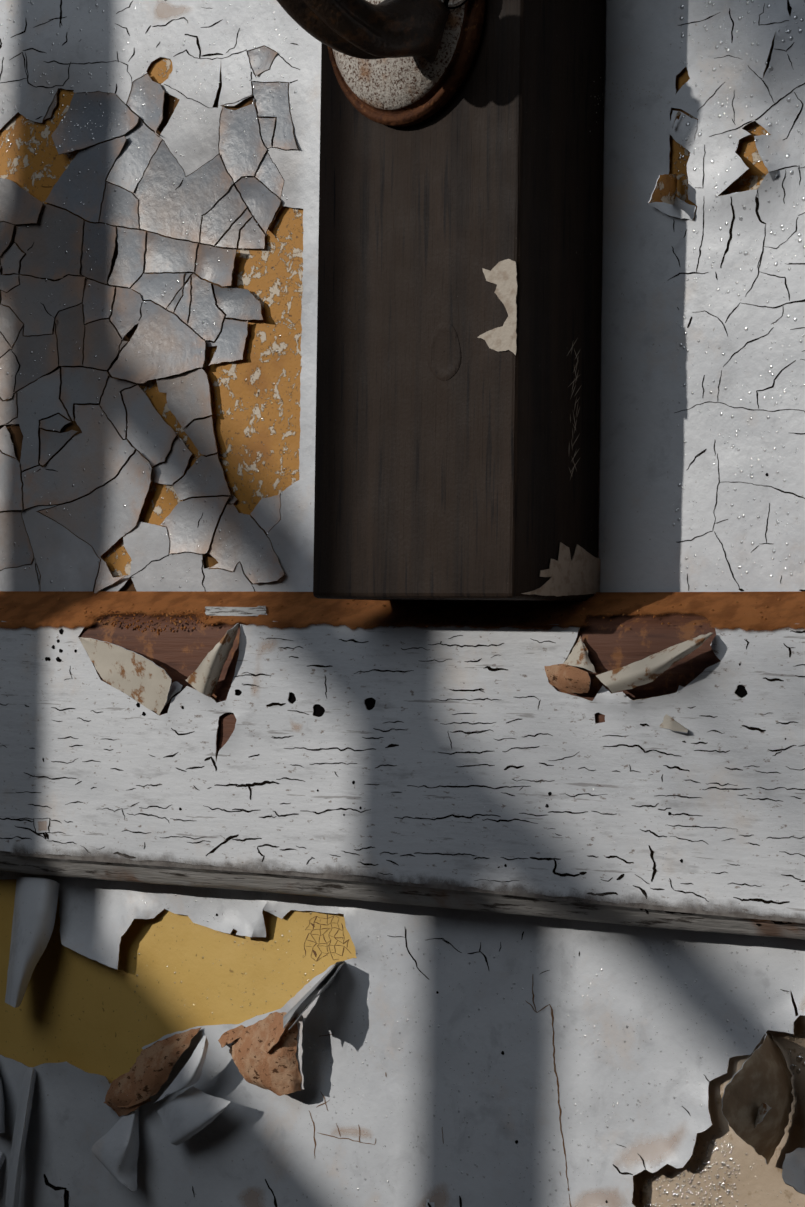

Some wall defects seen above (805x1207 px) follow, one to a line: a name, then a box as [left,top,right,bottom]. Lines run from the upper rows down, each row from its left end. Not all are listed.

crack [0,0,252,119]
crack [670,3,805,435]
peeling [719,121,771,196]
peeling [0,45,304,593]
crack [677,442,805,591]
peeling [45,623,239,716]
rust [0,591,805,631]
peeling [544,632,713,693]
crack [0,630,805,926]
peeling [0,877,357,1207]
peeling [633,1016,805,1207]
crack [44,1174,70,1207]